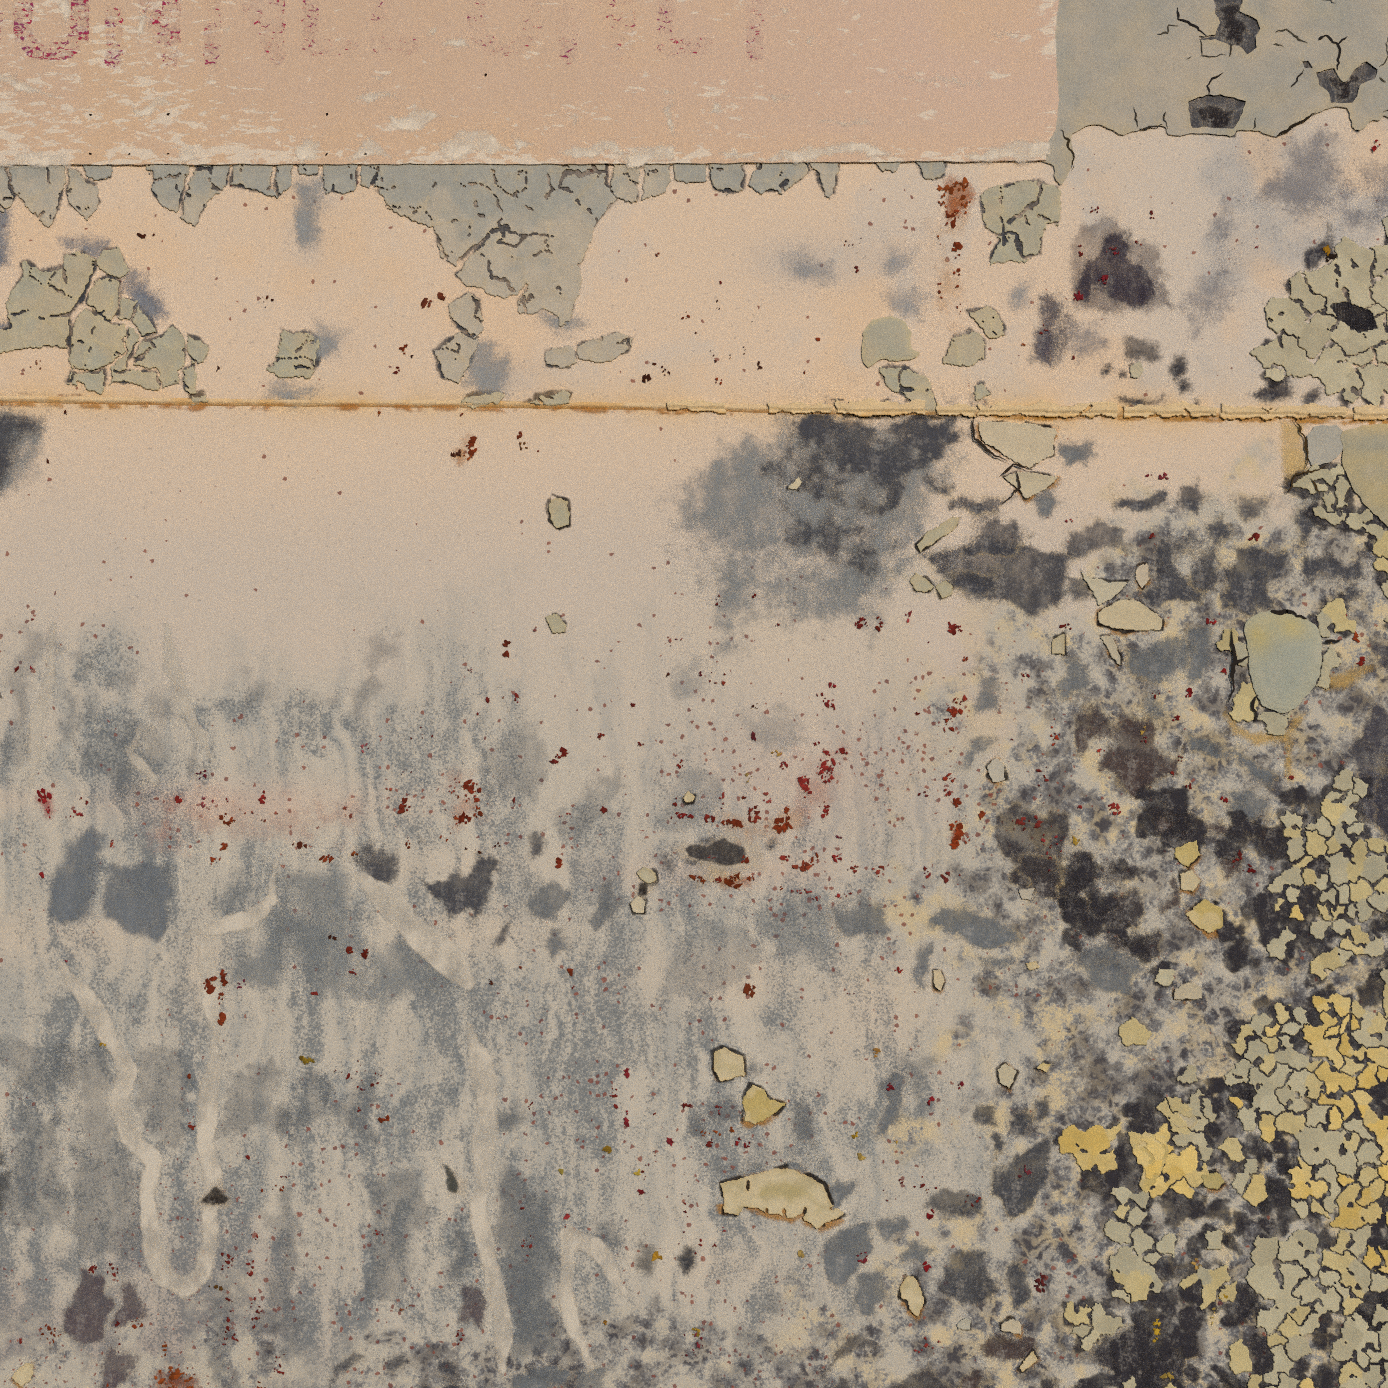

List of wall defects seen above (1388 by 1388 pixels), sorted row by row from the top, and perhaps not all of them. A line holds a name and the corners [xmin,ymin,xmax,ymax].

crack [1160,7,1232,93]
crack [1275,0,1348,87]
crack [1254,112,1316,136]
peeling [0,246,209,406]
peeling [146,162,839,409]
corrosion [937,177,974,314]
corrosion [671,792,793,834]
corrosion [780,741,848,818]
leakage [49,827,173,941]
leakage [58,858,359,1299]
leakage [450,1026,629,1374]
peeling [717,1162,1039,1388]